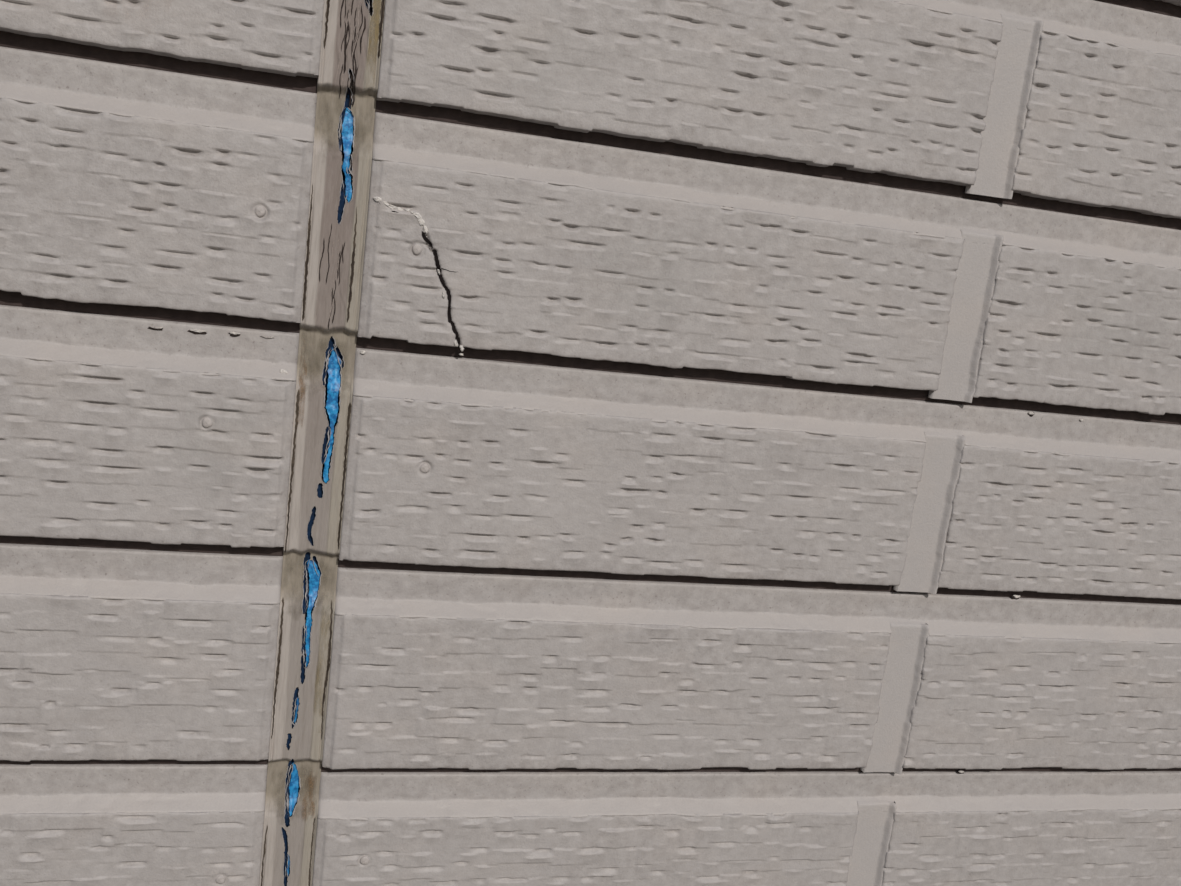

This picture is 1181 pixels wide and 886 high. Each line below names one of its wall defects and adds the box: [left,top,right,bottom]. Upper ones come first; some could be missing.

crack [261,0,464,886]